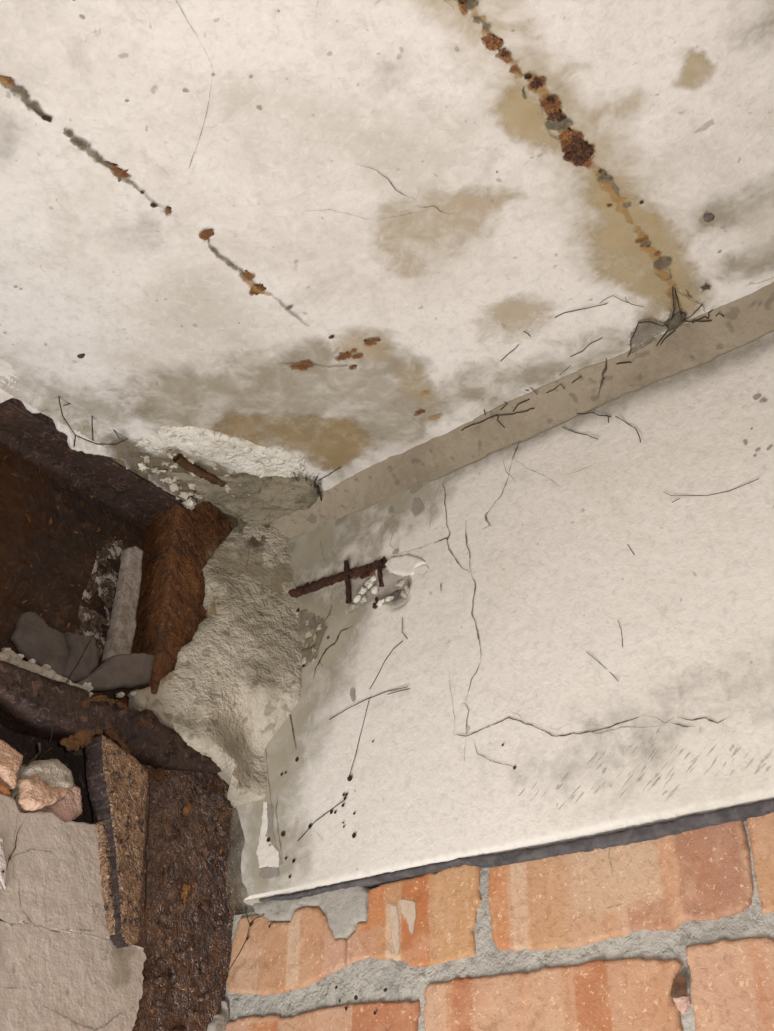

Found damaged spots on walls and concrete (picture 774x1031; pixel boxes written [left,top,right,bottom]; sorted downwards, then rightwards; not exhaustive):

water stain [682,54,711,87]
rust [198,229,214,240]
water stain [588,174,696,308]
rust [242,270,266,296]
rust [290,359,315,371]
rust [335,337,381,370]
water stain [345,343,386,358]
crack [598,358,607,397]
water stain [216,416,368,469]
spalling [411,484,424,516]
crack [417,440,727,767]
spalling [0,740,83,822]